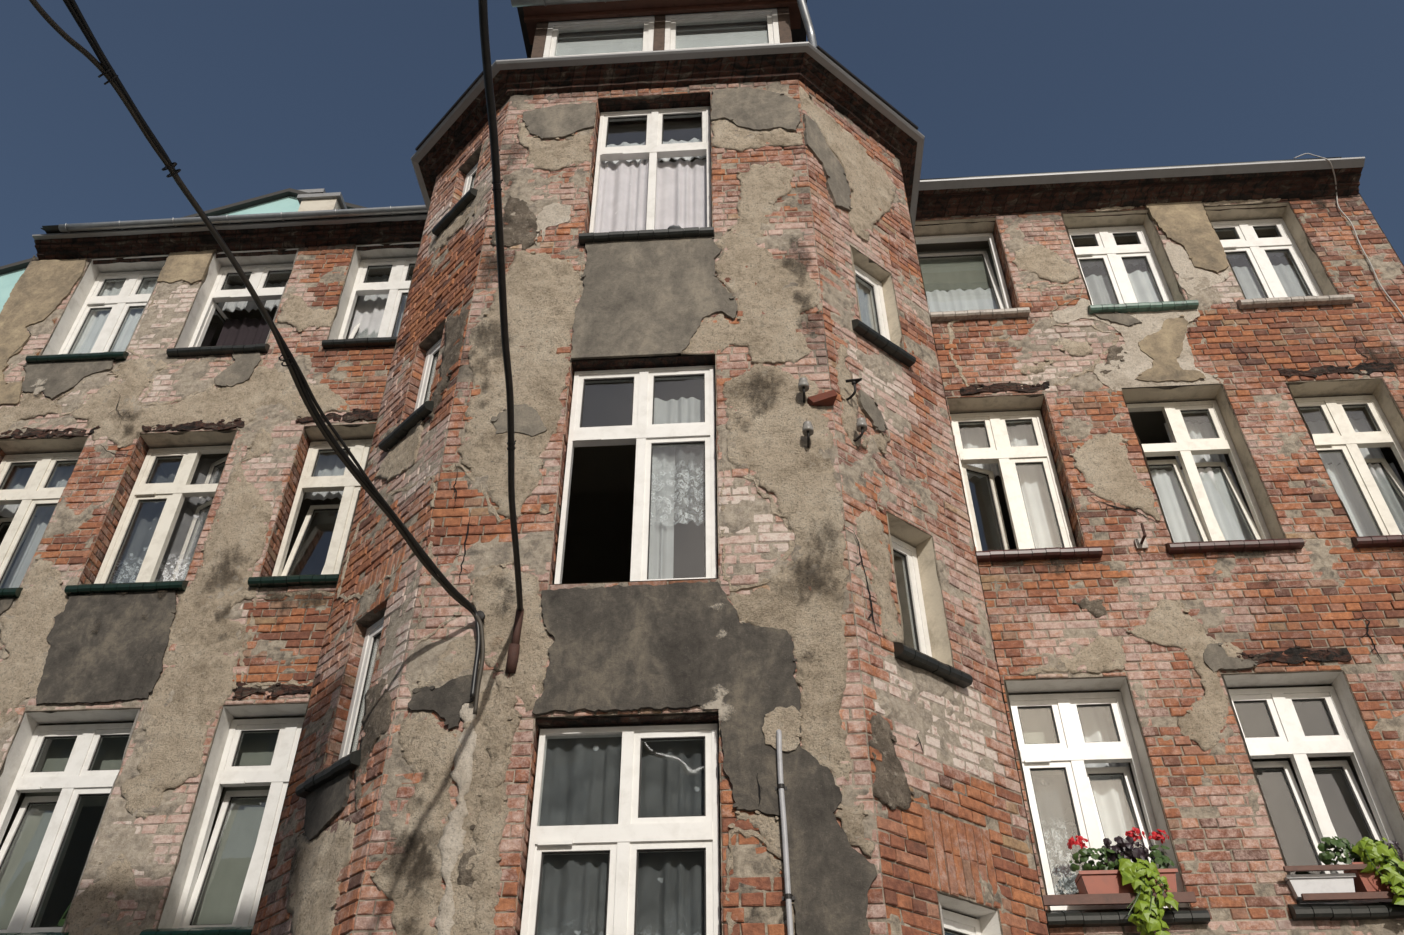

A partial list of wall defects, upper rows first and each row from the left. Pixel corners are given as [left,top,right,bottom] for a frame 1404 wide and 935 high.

flaking render [947,198,1281,391]
flaking render [0,86,915,935]
flaking render [1070,429,1161,522]
flaking render [1073,598,1107,618]
flaking render [1126,599,1258,751]